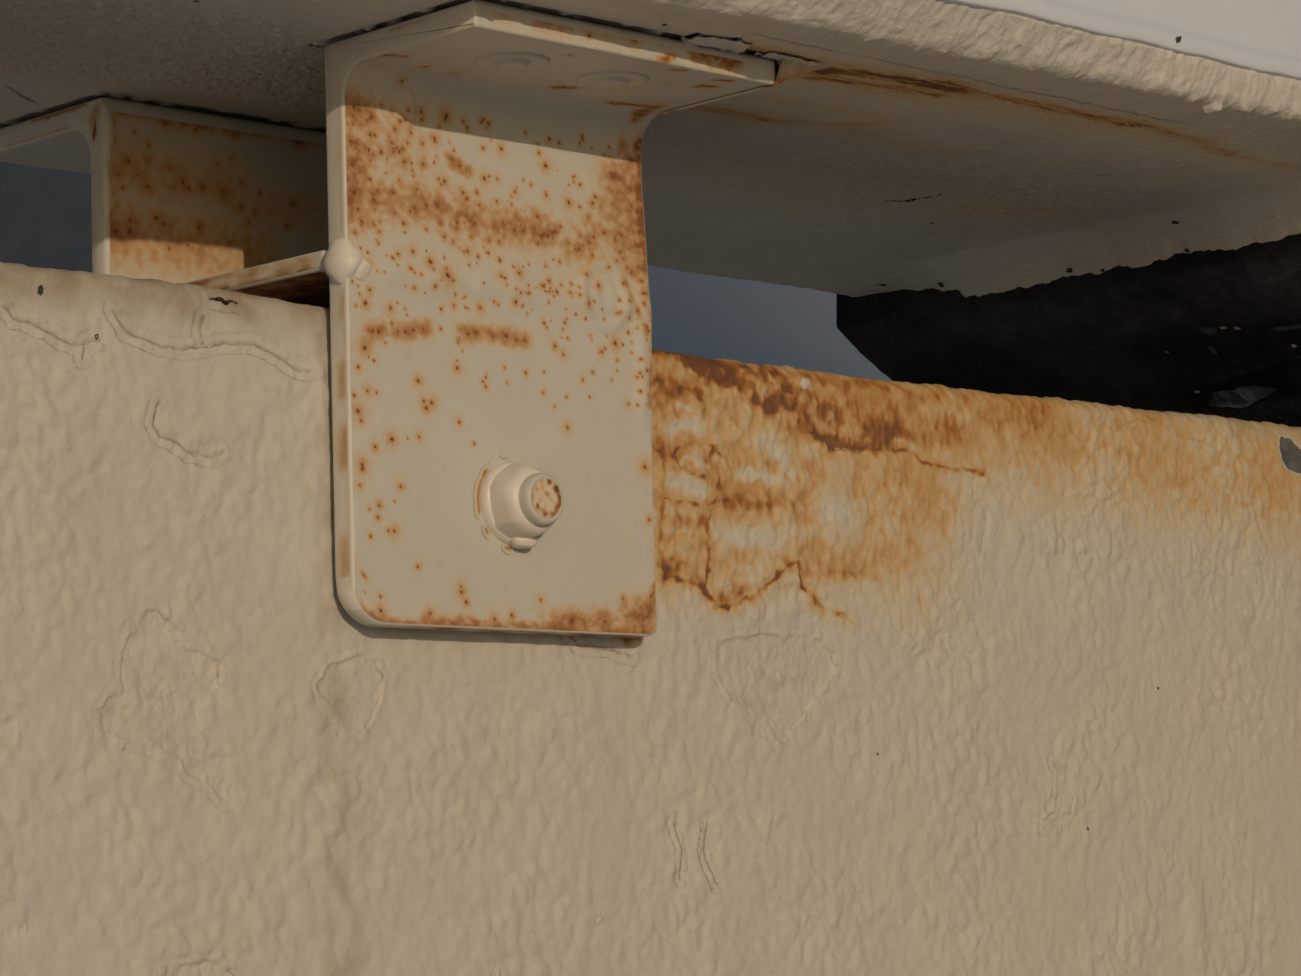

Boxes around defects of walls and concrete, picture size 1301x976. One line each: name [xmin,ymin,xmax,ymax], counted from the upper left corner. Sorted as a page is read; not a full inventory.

crack [684,33,752,45]
crack [0,295,110,369]
crack [200,289,247,314]
rust [6,9,1301,671]
crack [145,390,233,468]
spalling [1278,434,1301,477]